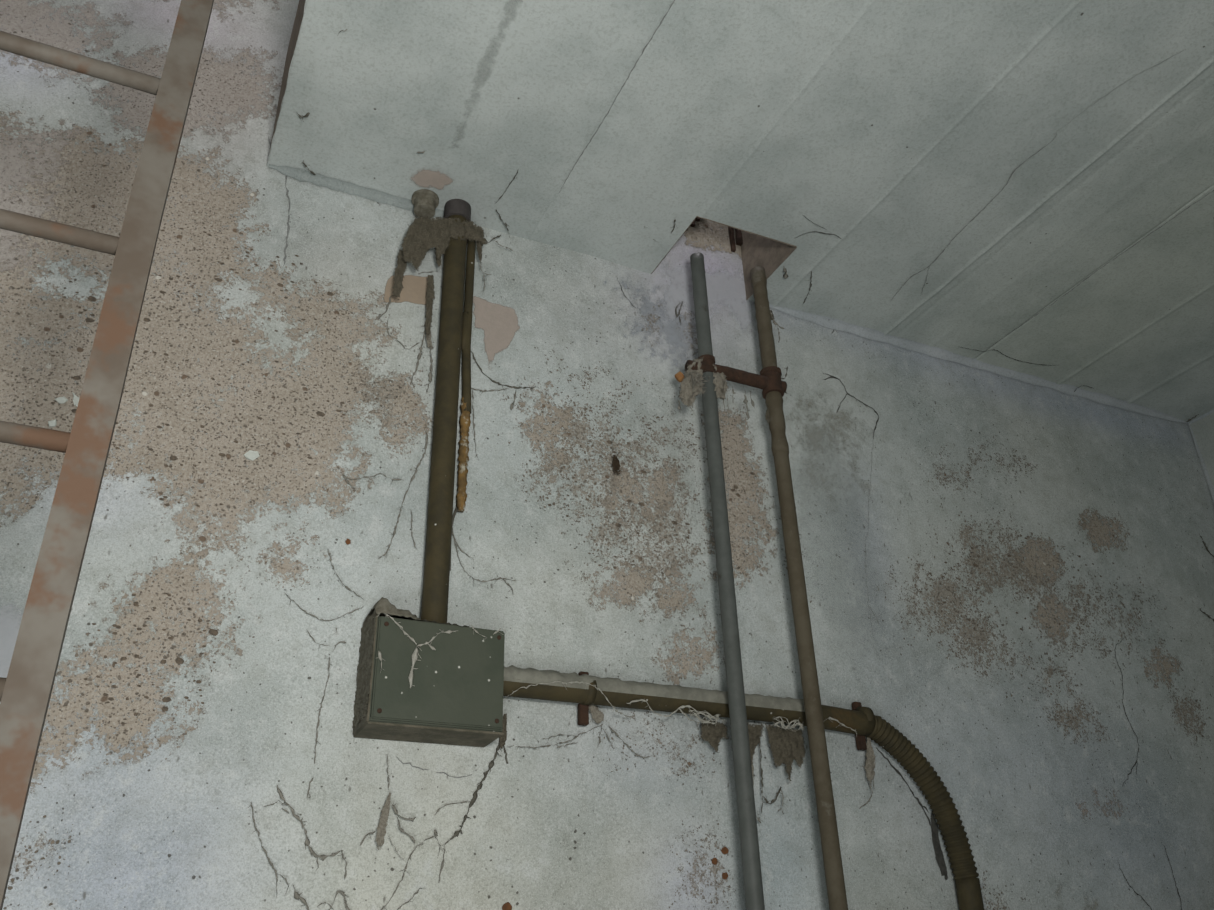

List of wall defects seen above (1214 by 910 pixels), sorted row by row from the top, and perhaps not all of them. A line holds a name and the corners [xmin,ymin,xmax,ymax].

spalling [0,50,156,237]
spalling [0,0,169,78]
crack [559,0,675,193]
crack [892,49,1185,299]
spalling [0,442,65,527]
spalling [0,229,115,433]
spalling [28,45,434,795]
spalling [485,342,787,685]
spalling [876,435,1210,755]
crack [398,759,472,778]